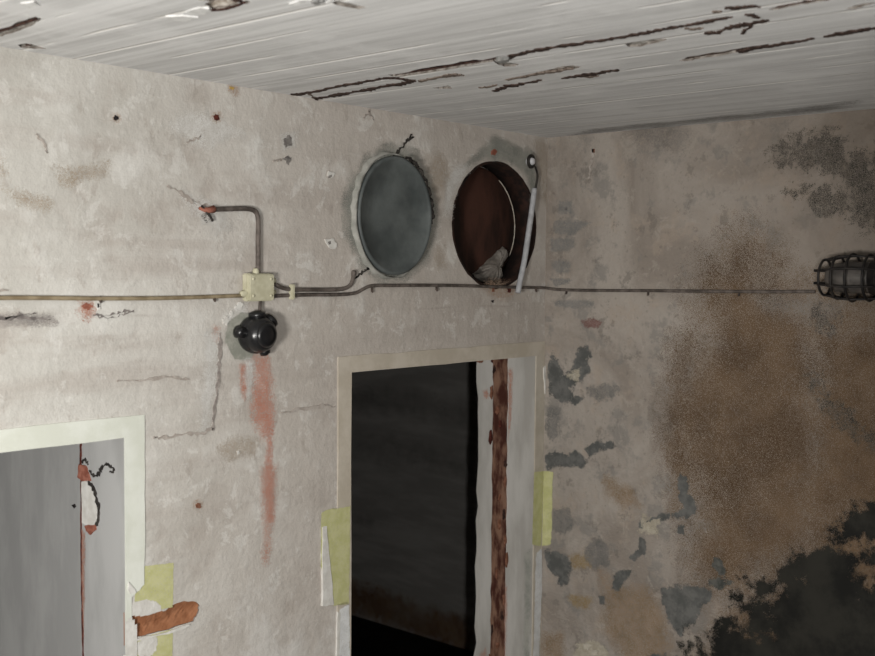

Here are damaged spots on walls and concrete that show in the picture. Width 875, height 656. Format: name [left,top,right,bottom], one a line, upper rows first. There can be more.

spalling [165,0,248,22]
crack [290,5,875,120]
crack [117,328,223,440]
rust [238,354,280,567]
crack [281,404,335,413]
rust [479,359,513,656]
peeling [552,505,575,535]
peeling [543,345,621,472]
peeling [584,474,698,592]
leakage [567,206,875,656]
peeling [533,548,572,656]
peeling [659,557,733,637]